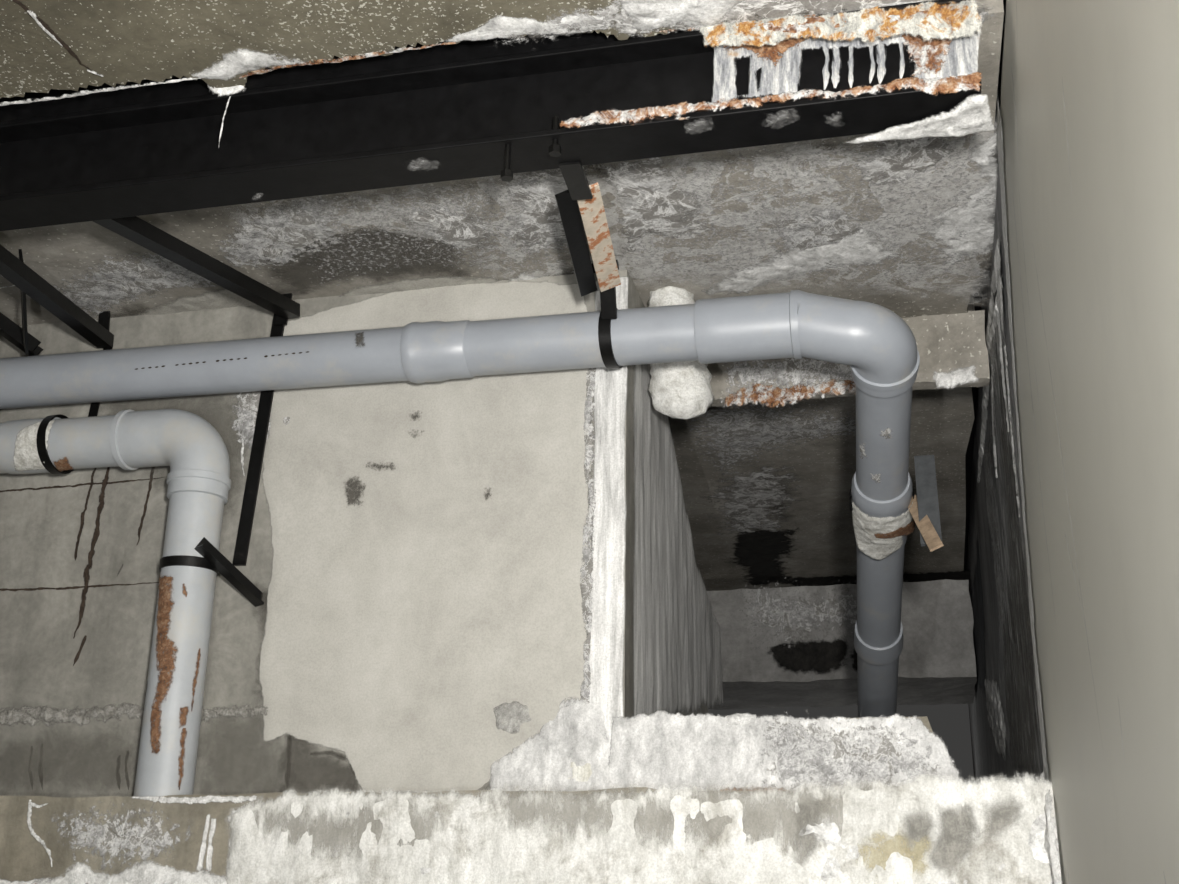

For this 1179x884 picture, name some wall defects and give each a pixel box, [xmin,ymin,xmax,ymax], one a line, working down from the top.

crack [11,0,103,77]
rust [723,36,807,66]
damp [218,168,575,293]
damp [53,249,215,319]
damp [232,391,290,476]
rust [724,379,856,408]
damp [580,94,1049,791]
rust [138,576,187,753]
rust [178,648,201,790]
damp [282,735,357,791]
damp [490,698,611,794]
damp [0,771,1062,884]